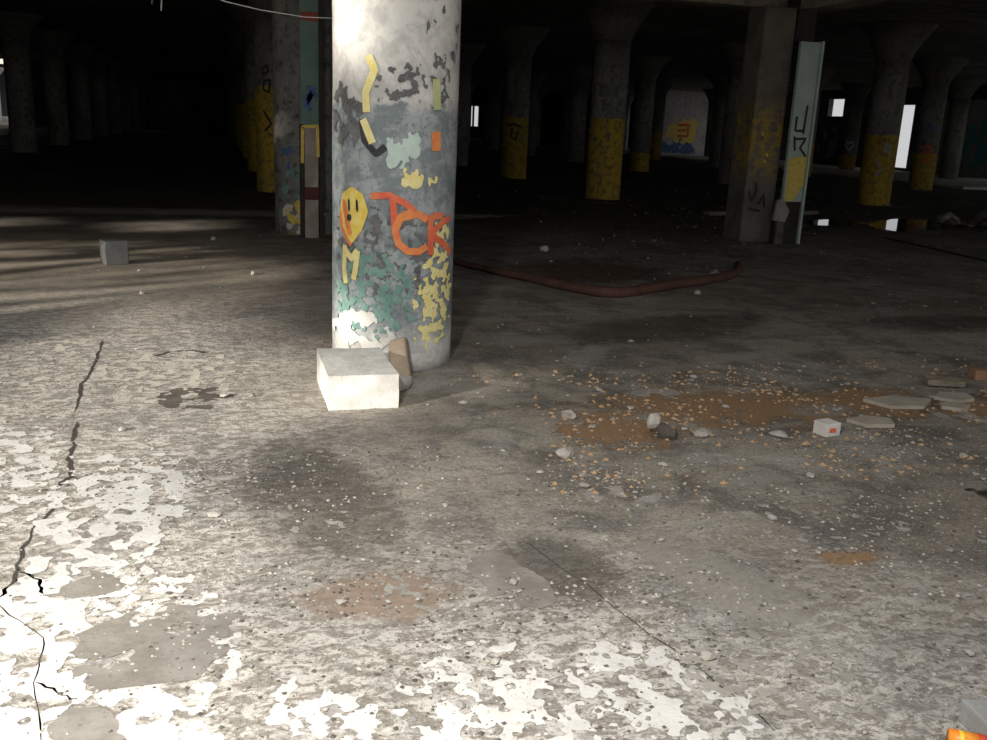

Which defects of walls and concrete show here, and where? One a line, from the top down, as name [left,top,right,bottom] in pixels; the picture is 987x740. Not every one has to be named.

peeling [374,23,459,104]
peeling [333,81,364,147]
peeling [324,131,452,350]
crack [0,341,103,740]
spalling [365,533,558,628]
spalling [579,482,662,507]
peeling [264,671,382,740]
peeling [395,637,764,740]